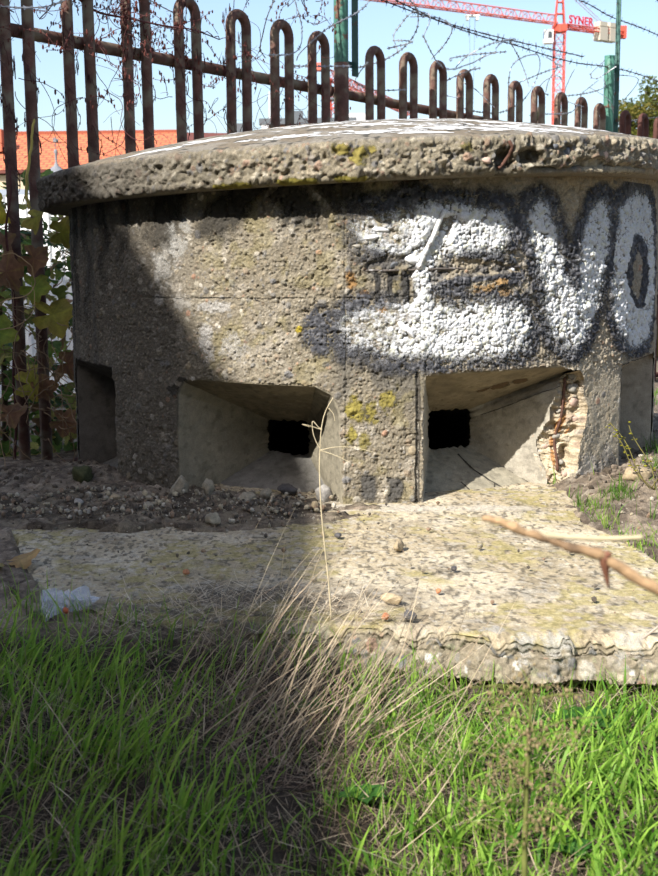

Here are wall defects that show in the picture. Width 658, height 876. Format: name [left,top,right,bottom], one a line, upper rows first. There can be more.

rust [549,397,569,465]
spalling [531,370,588,484]